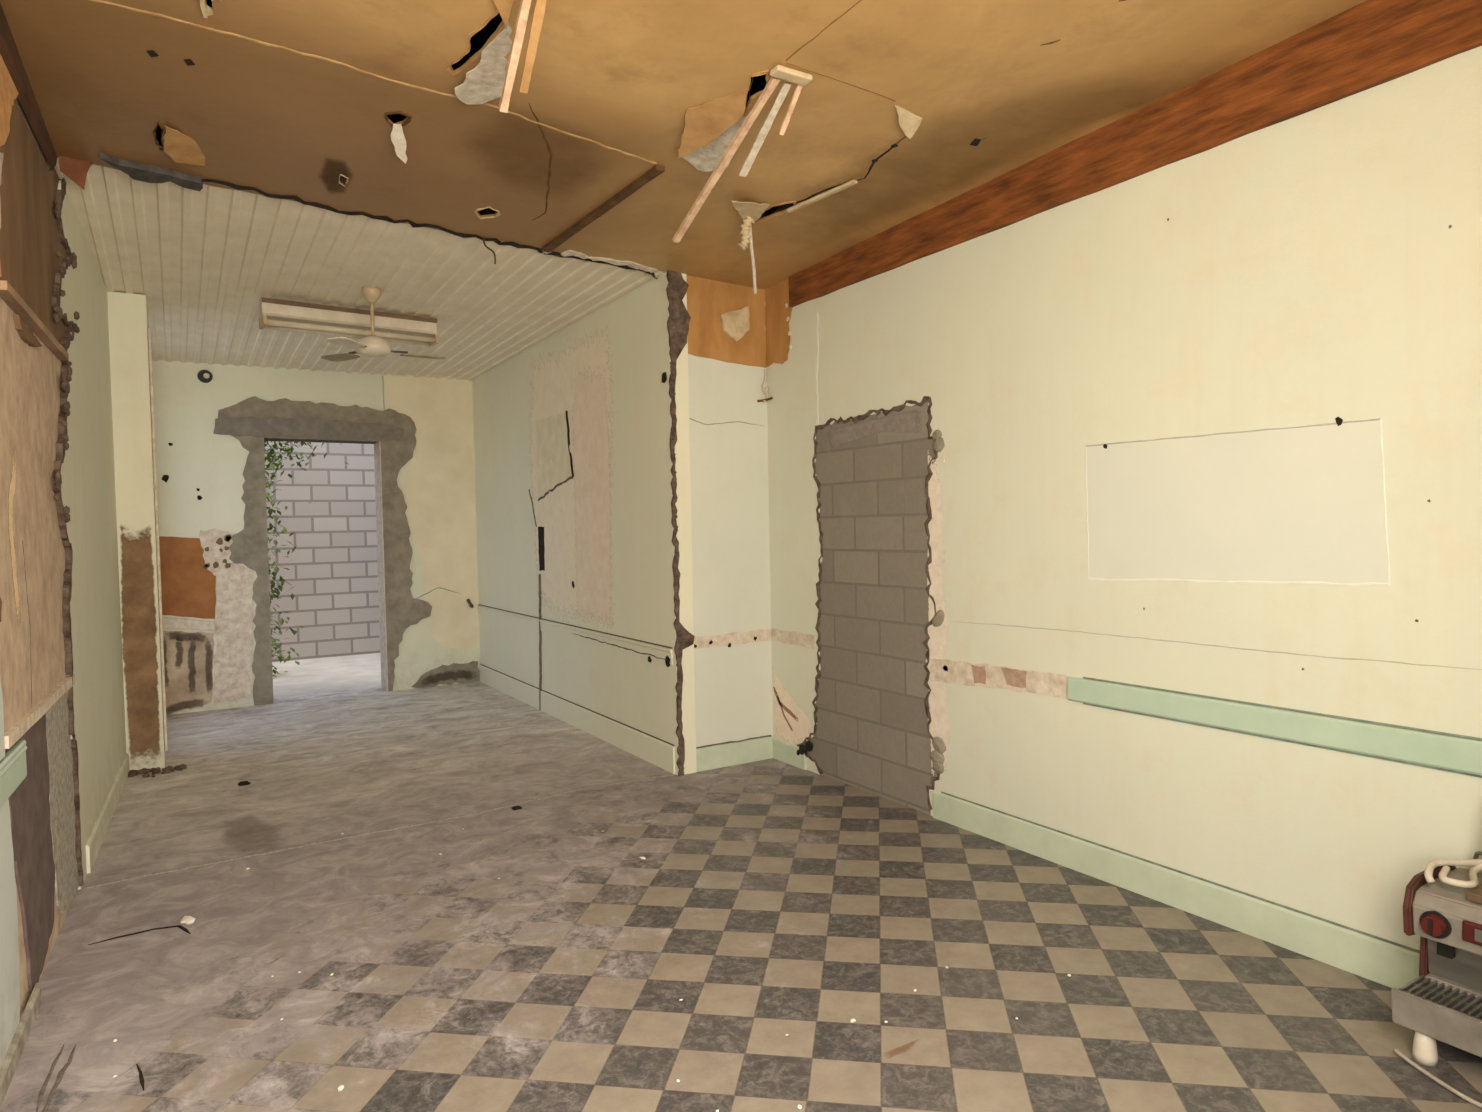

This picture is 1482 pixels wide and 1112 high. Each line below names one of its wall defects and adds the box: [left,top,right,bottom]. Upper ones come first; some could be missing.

peeling [455,0,514,104]
spalling [100,126,205,191]
spalling [46,178,83,915]
spalling [199,529,235,576]
spalling [542,250,1070,810]